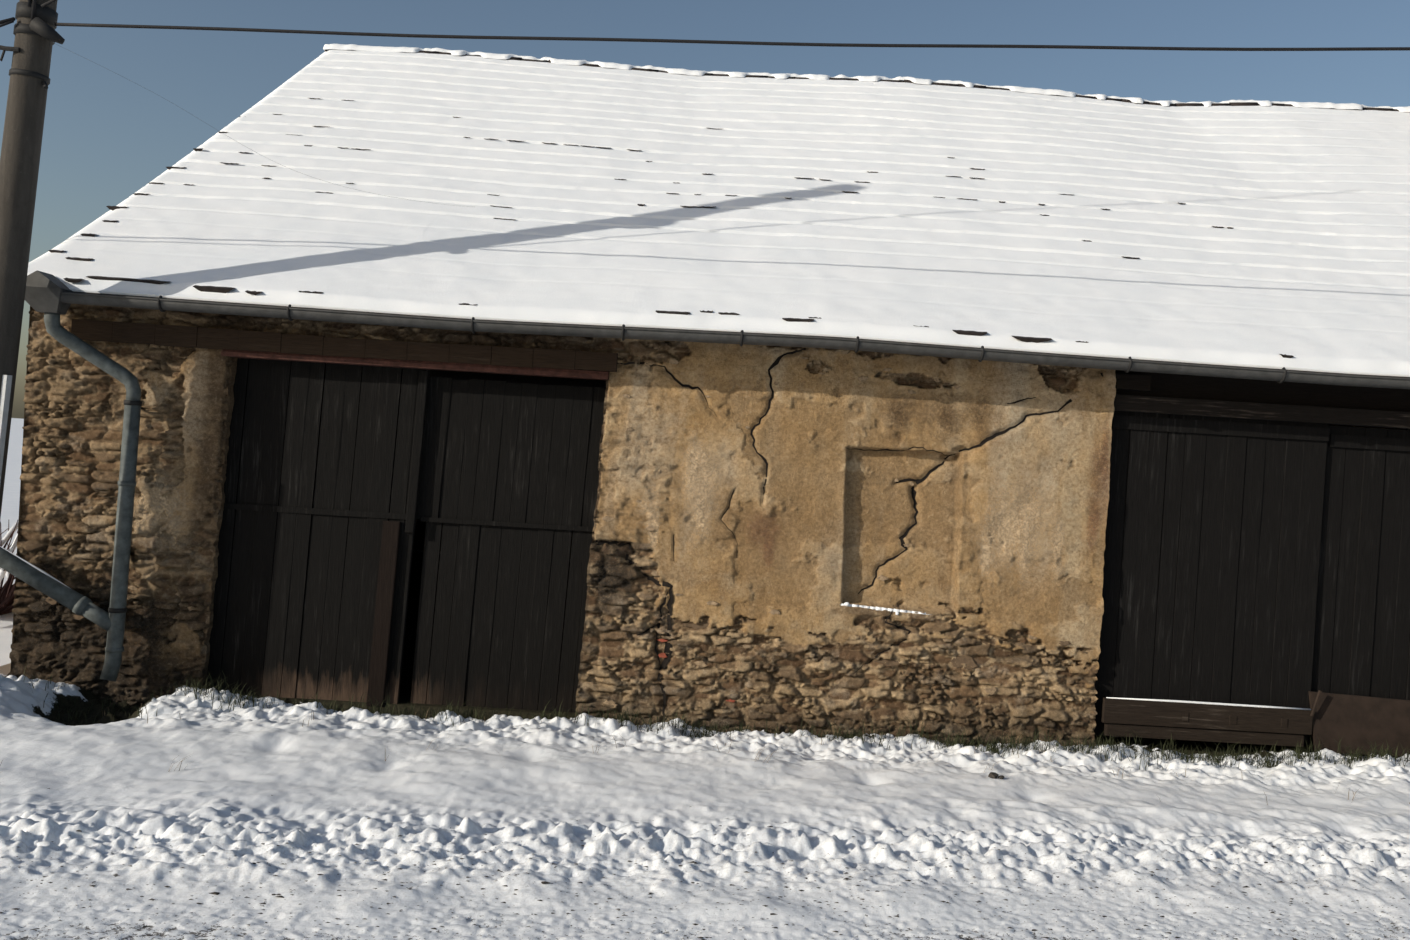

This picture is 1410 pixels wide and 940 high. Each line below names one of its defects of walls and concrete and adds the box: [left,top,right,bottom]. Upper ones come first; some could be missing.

flaking render [5,304,248,706]
crack [594,534,683,722]
flaking render [595,337,692,365]
crack [617,348,806,550]
flaking render [575,380,1099,746]
crack [847,397,1072,671]